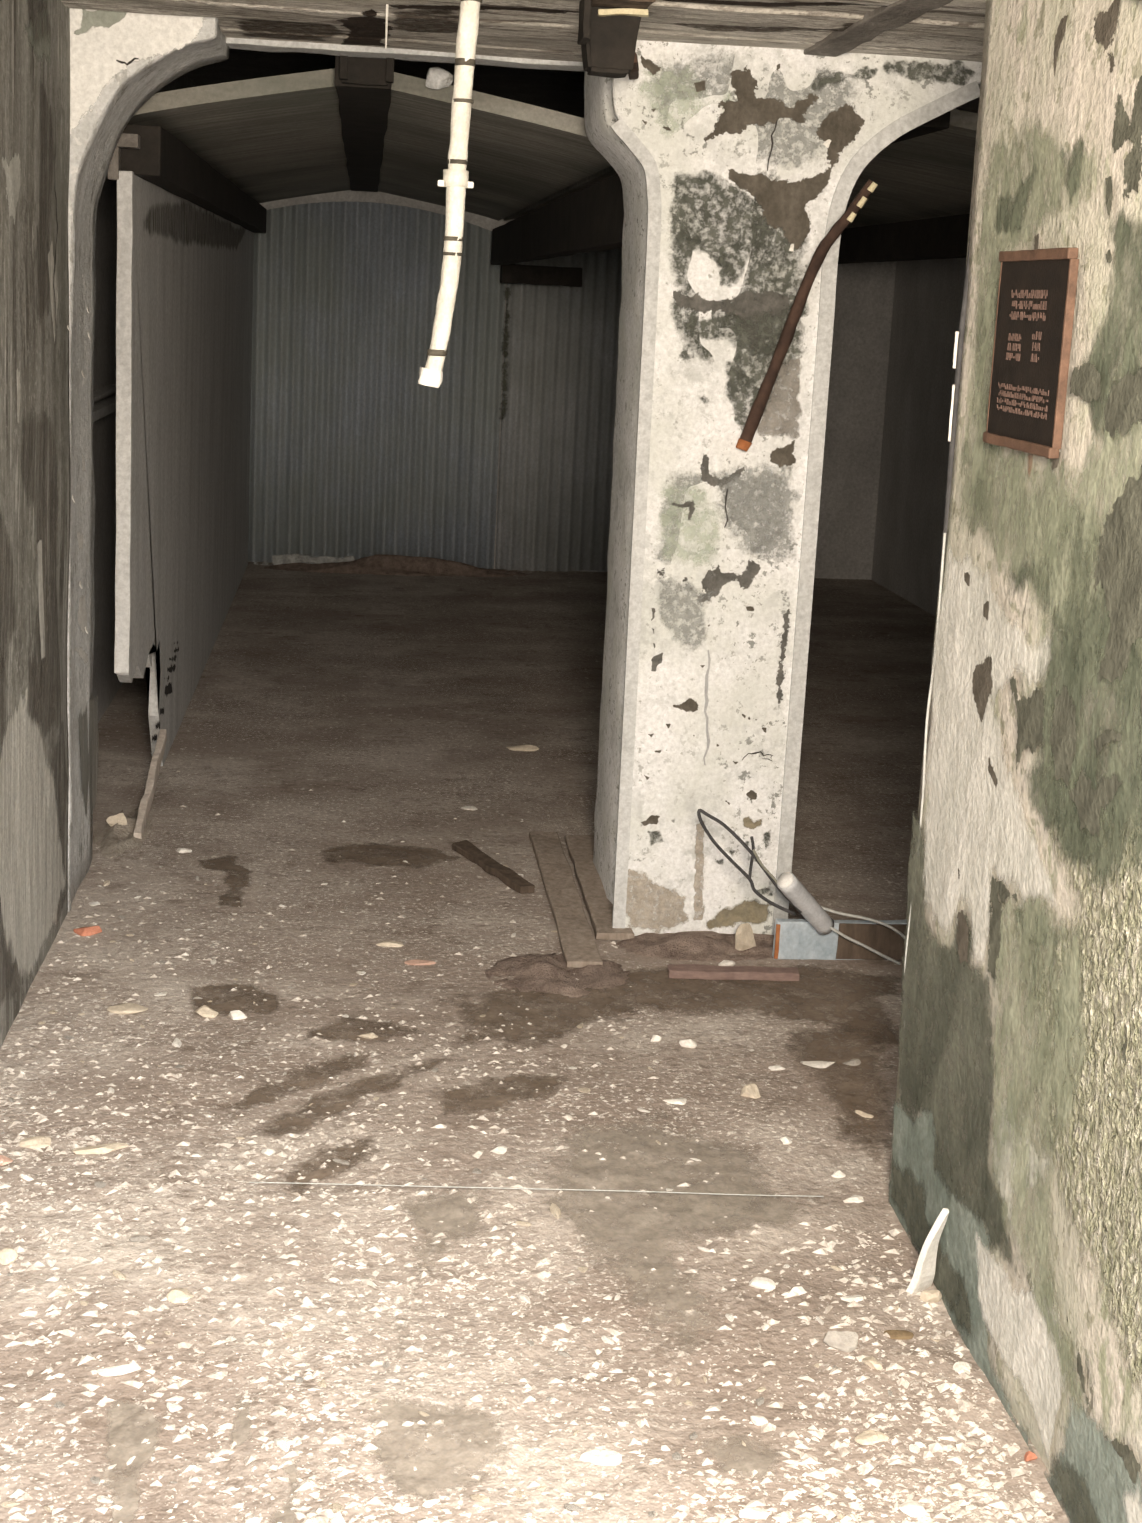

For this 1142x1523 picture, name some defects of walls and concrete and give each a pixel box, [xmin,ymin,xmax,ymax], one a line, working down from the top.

water stain [26,0,51,62]
spalling [337,4,460,46]
peeling [1053,15,1068,76]
peeling [1094,0,1121,73]
peeling [1105,76,1142,216]
water stain [37,84,58,343]
spalling [700,454,745,487]
peeling [1094,465,1142,683]
water stain [0,368,99,999]
peeling [743,790,762,829]
water stain [232,1018,441,1135]
water stain [442,551,1142,1523]